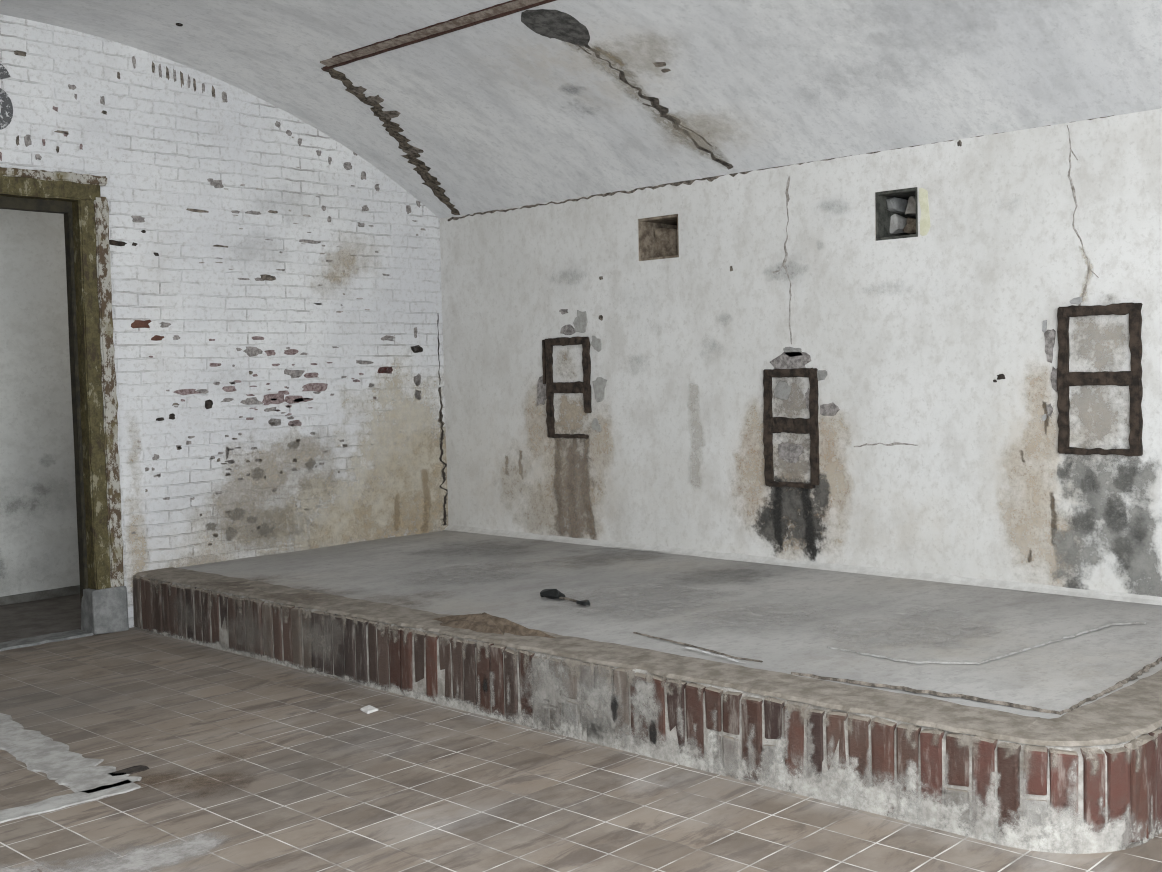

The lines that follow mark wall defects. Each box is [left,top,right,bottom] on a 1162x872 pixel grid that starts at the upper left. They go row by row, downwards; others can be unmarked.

crack [1035,115,1114,306]
peeling [0,130,146,587]
peeling [131,320,180,341]
peeling [209,433,277,492]
peeling [156,336,334,443]
damp [169,363,448,568]
damp [1001,377,1162,597]
damp [1072,318,1126,372]